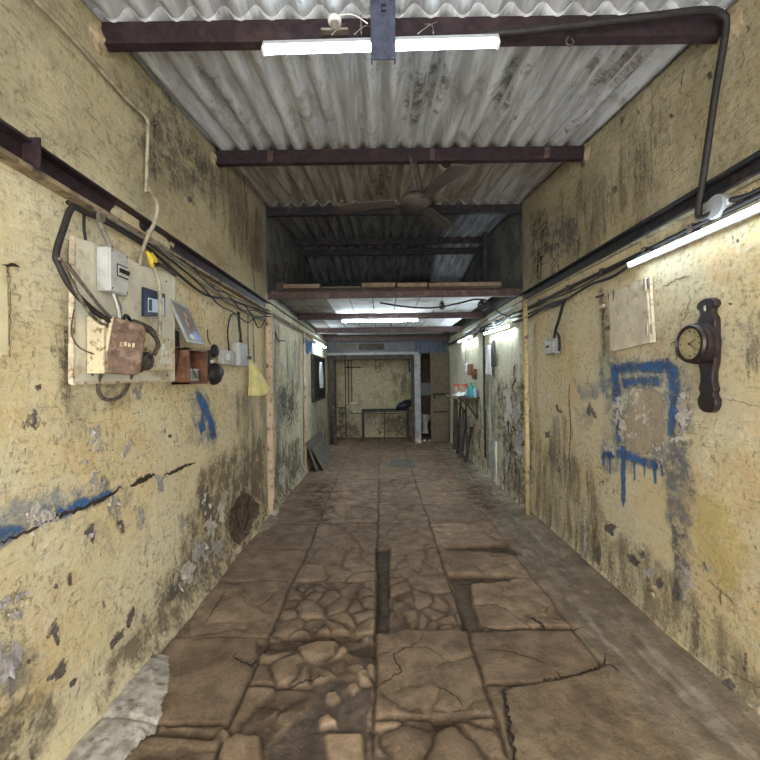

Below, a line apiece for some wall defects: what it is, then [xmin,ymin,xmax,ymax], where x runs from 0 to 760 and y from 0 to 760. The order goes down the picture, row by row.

water stain [492,57,530,108]
water stain [135,109,262,269]
water stain [530,142,647,278]
crack [1,462,195,543]
water stain [105,328,305,697]
spalling [167,485,263,602]
water stain [464,361,603,561]
peeling [612,388,693,468]
water stain [637,443,704,654]
peeling [0,641,31,686]
crack [377,634,423,688]
crack [488,649,620,760]